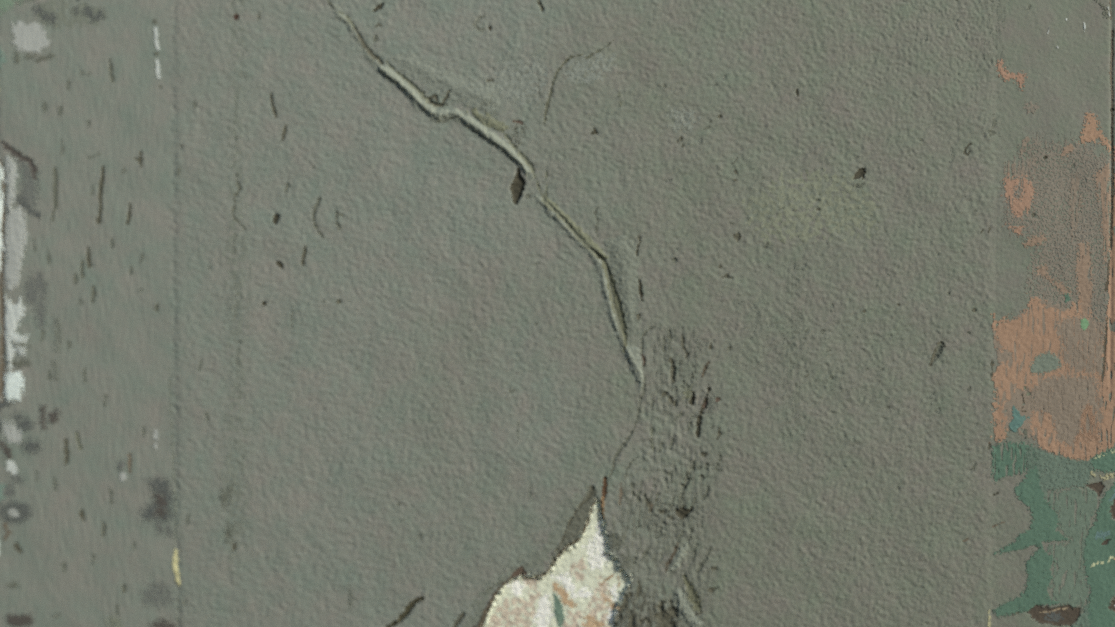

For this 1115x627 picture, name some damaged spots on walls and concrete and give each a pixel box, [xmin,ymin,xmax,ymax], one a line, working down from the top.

crack [327,0,656,555]
spalling [651,330,721,440]
spalling [478,452,710,627]
spalling [667,527,719,616]